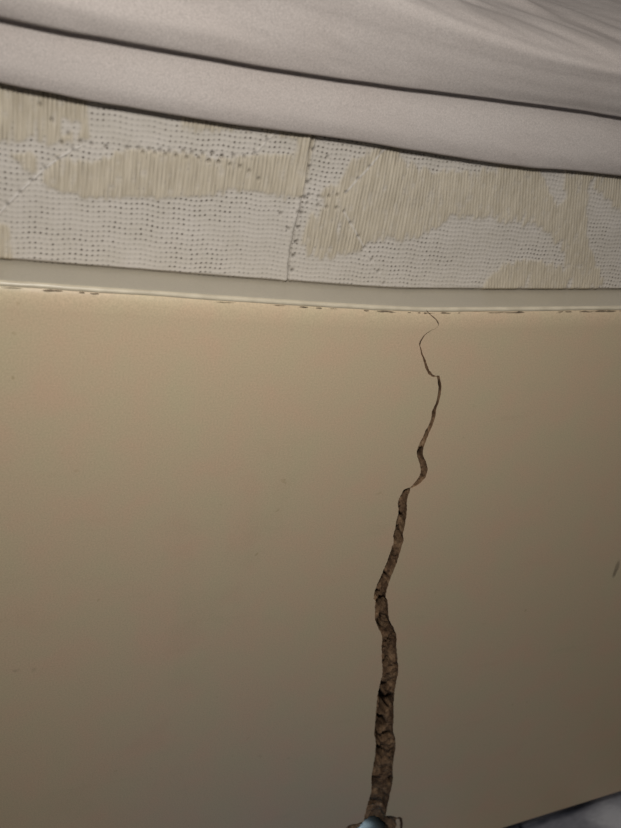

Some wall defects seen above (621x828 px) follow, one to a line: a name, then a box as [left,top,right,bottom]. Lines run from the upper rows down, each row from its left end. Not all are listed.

crack [368,311,441,810]